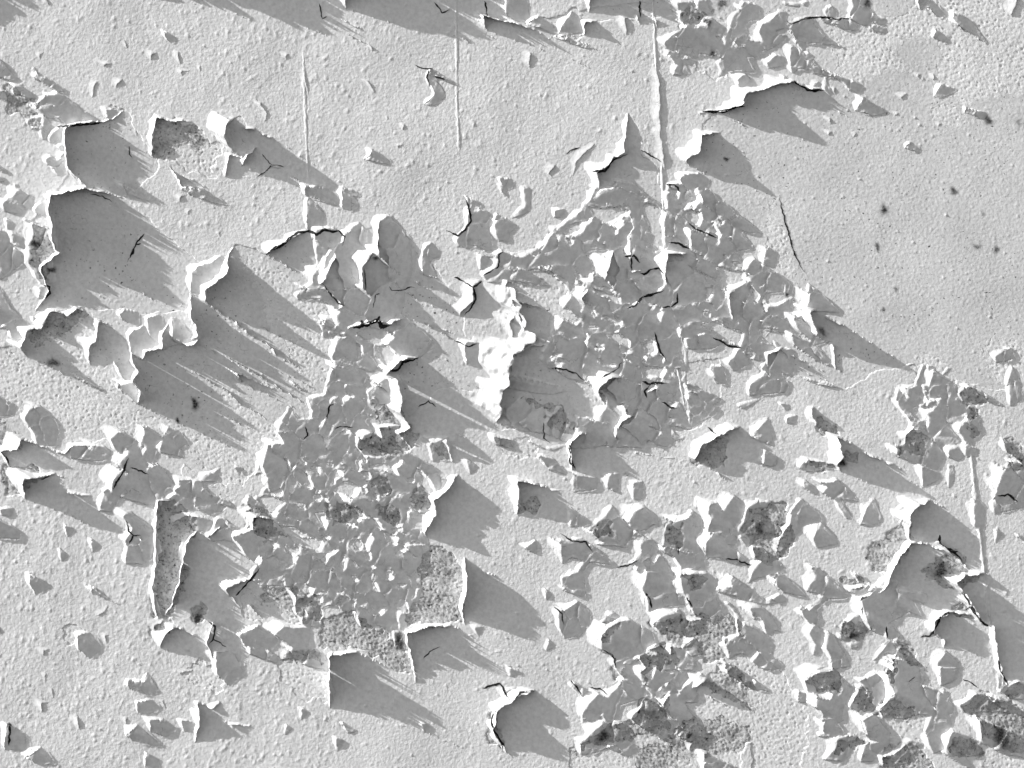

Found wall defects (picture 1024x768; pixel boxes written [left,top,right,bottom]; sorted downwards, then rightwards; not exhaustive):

peeling [452,194,538,265]
crack [779,199,803,270]
peeling [292,428,350,490]
peeling [307,462,429,572]
peeling [680,422,741,480]
peeling [795,406,901,527]
peeling [884,383,980,488]
peeling [958,436,1024,544]
peeling [236,474,467,709]
peeling [547,489,1024,768]
peeling [119,622,243,767]
peeling [486,664,535,758]